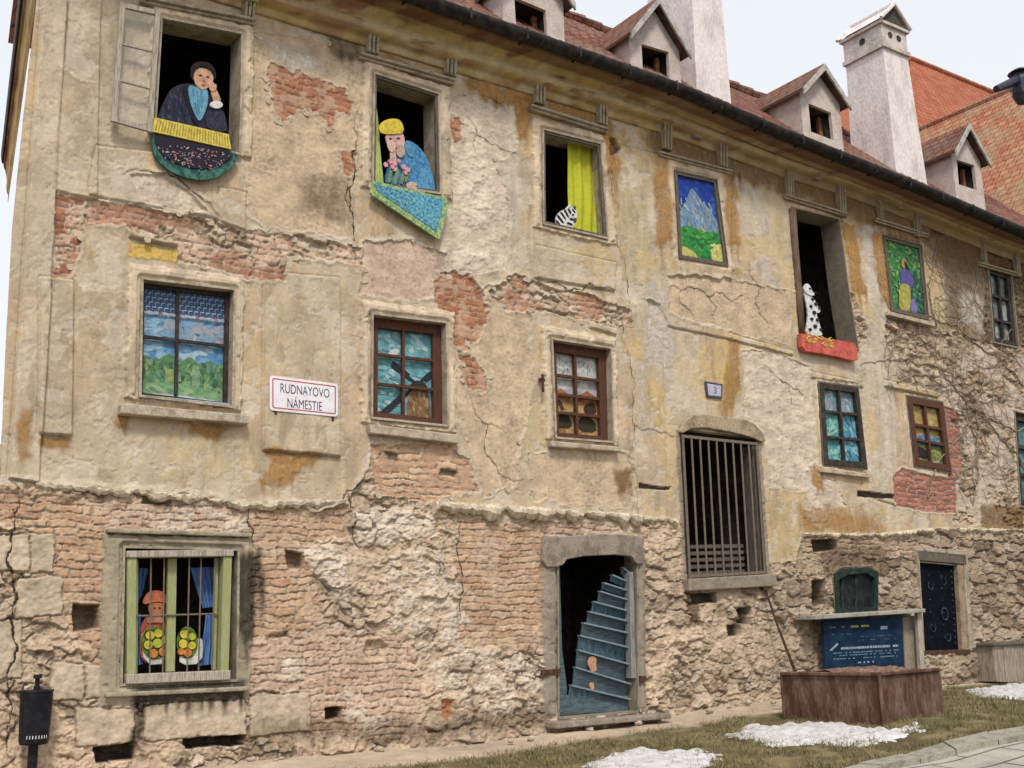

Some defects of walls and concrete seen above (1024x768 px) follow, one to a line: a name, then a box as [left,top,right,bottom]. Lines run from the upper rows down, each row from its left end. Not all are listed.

crack [345,108,359,261]
flaking render [50,29,672,510]
crack [670,270,767,321]
damp [649,130,1024,343]
flaking render [645,246,1024,553]
crack [5,482,25,761]
spalling [71,602,101,632]
spalling [285,549,306,569]
crack [456,515,464,629]
spalling [689,591,718,605]
spalling [727,606,752,636]
spalling [324,705,343,721]